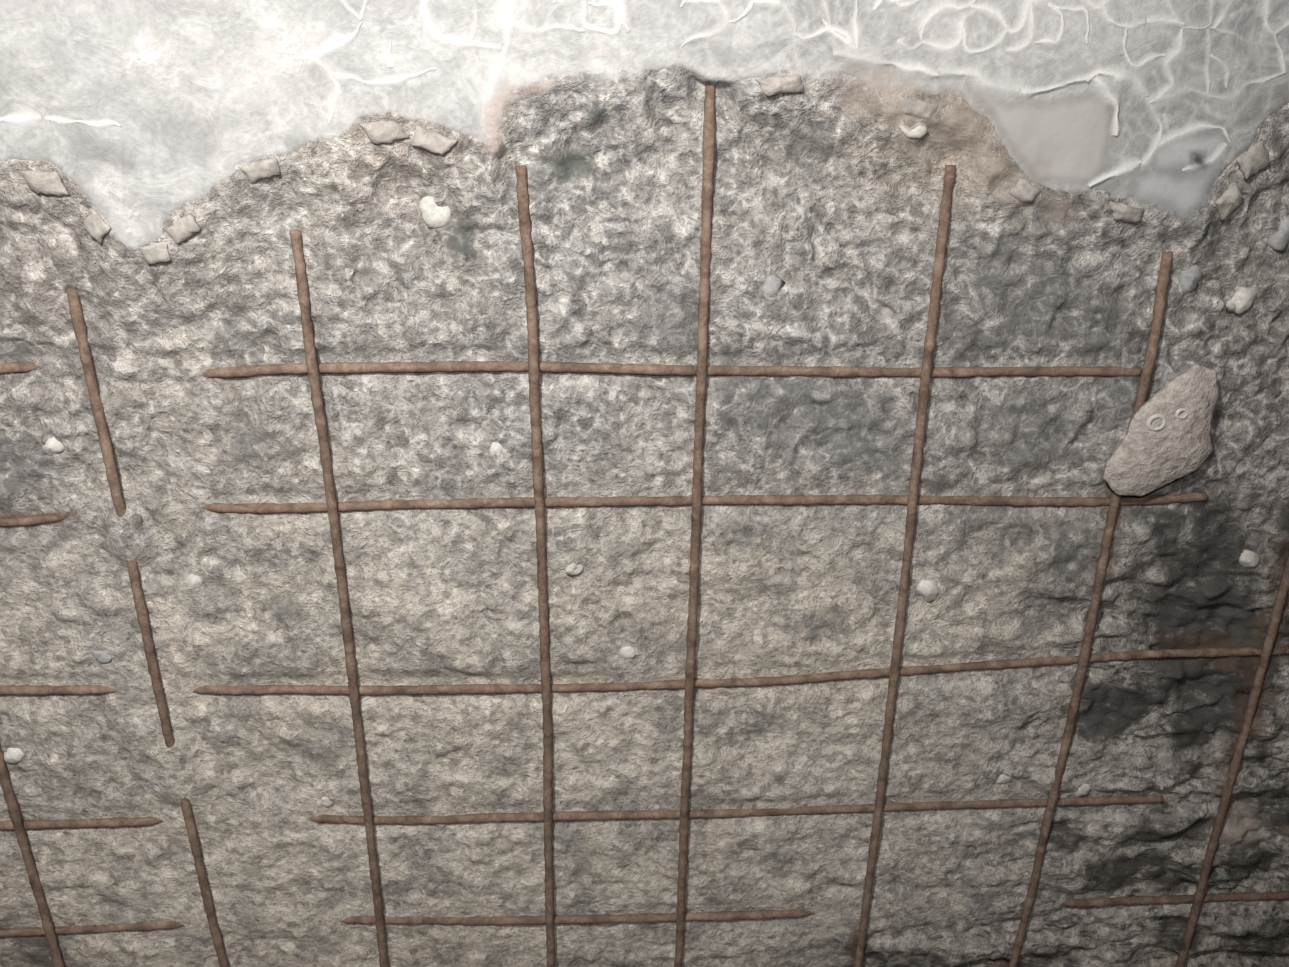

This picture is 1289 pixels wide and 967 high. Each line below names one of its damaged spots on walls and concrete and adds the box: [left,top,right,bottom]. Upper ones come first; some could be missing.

crack [0,116,120,127]
crack [292,0,626,145]
crack [681,0,780,44]
crack [795,0,1289,179]
spalling [289,230,547,967]
spalling [515,165,697,967]
spalling [674,82,922,967]
spalling [854,165,1144,967]
damp [1076,483,1289,775]
damp [1082,819,1211,891]
rust [1222,801,1259,844]
damp [1216,843,1279,882]